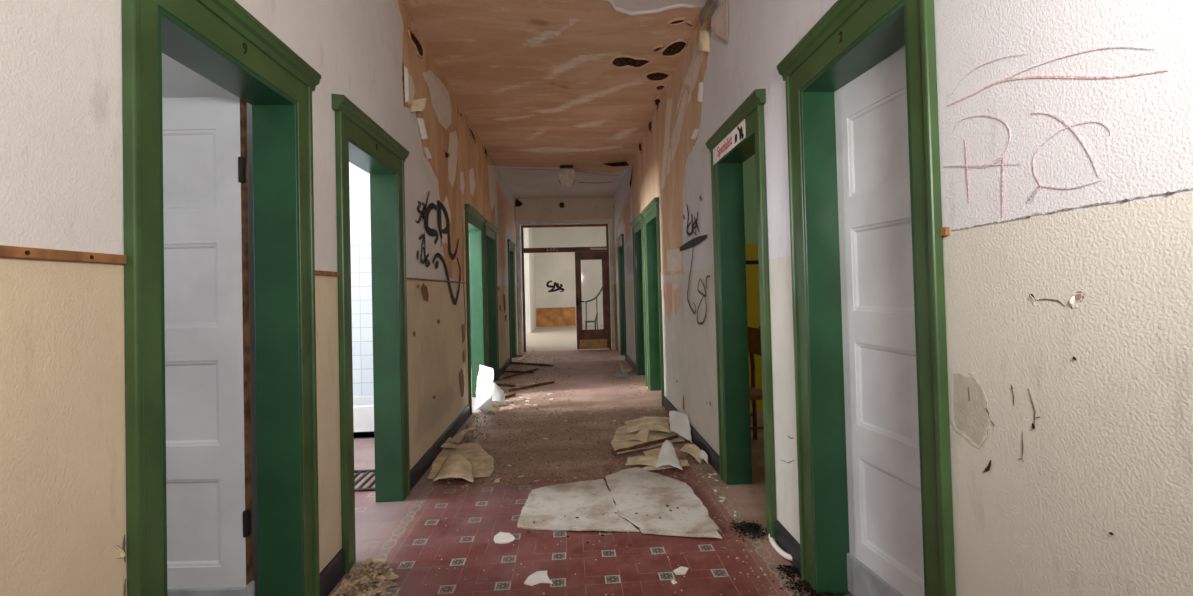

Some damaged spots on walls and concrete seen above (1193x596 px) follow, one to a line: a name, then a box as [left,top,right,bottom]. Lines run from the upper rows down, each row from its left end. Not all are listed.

peeling [397,0,728,282]